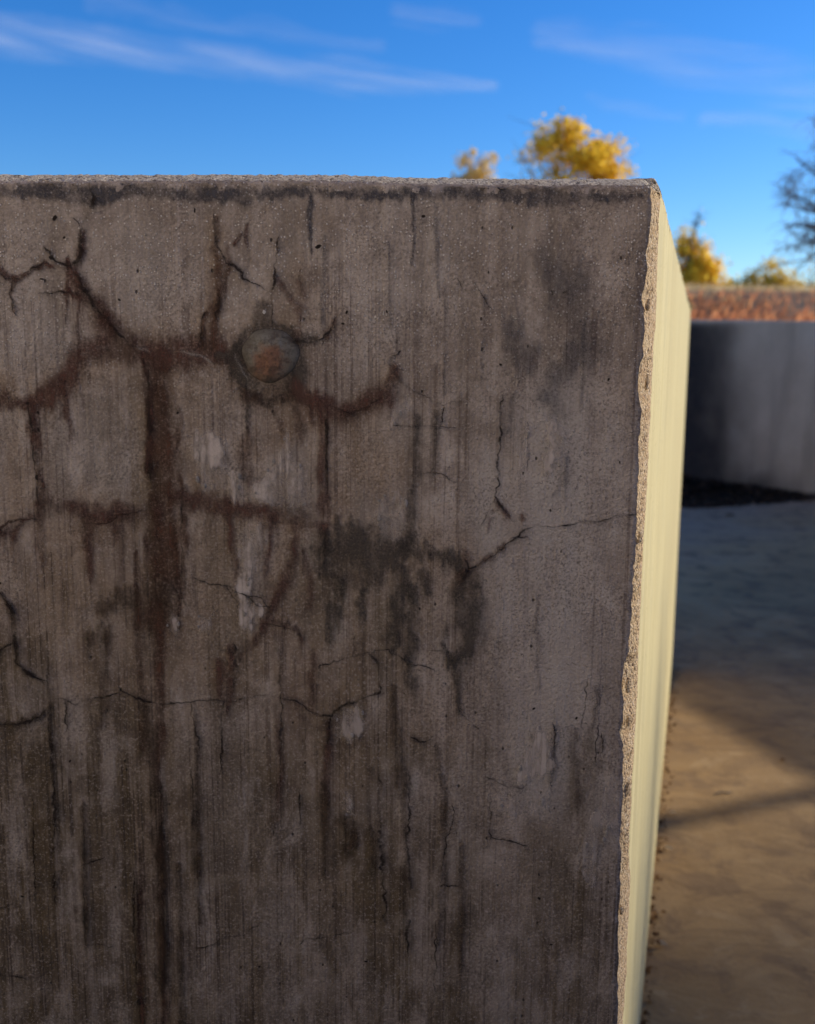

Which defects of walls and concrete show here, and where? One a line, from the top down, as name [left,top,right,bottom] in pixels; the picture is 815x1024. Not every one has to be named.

damp [0,231,121,454]
crack [1,193,125,339]
damp [13,183,149,205]
damp [164,187,313,254]
crack [200,214,335,345]
damp [327,186,431,257]
crack [0,401,39,531]
damp [0,475,130,582]
crack [145,369,153,481]
damp [128,301,399,646]
crack [324,400,378,488]
crack [463,397,636,580]